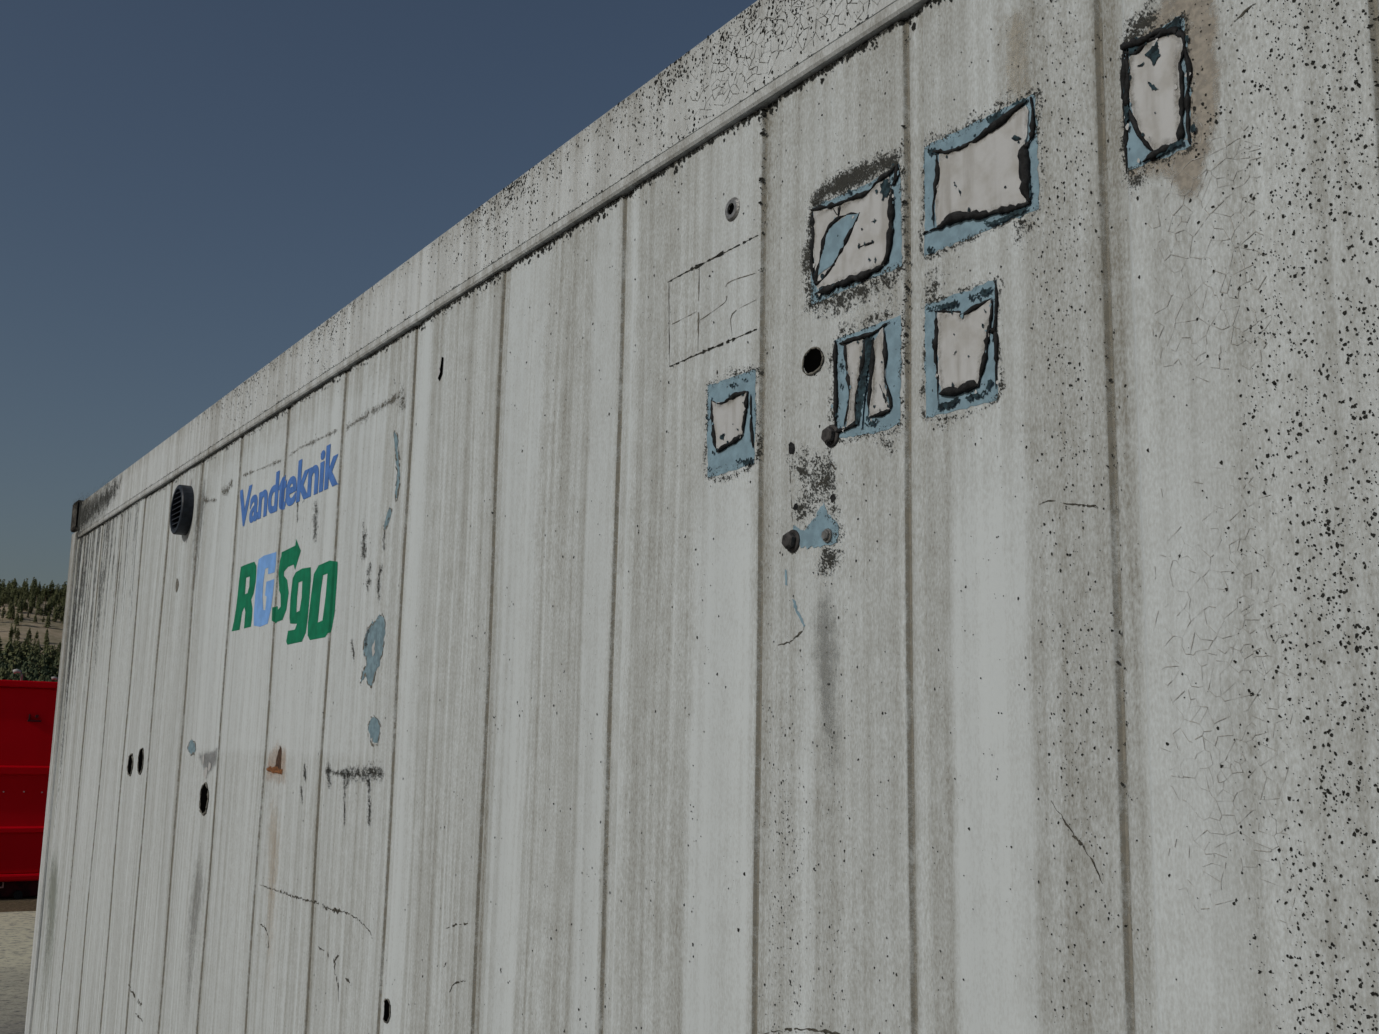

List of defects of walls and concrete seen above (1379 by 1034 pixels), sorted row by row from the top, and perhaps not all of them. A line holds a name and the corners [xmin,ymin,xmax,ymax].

crack [684,0,880,128]
peeling [1119,11,1196,179]
peeling [806,90,1045,306]
peeling [831,275,1005,443]
peeling [703,367,764,482]
peeling [350,430,400,688]
peeling [782,463,839,553]
water stain [789,0,1379,1034]
corrosion [266,747,282,774]
crack [261,885,371,934]
crack [318,946,350,1001]
crack [764,1026,840,1034]